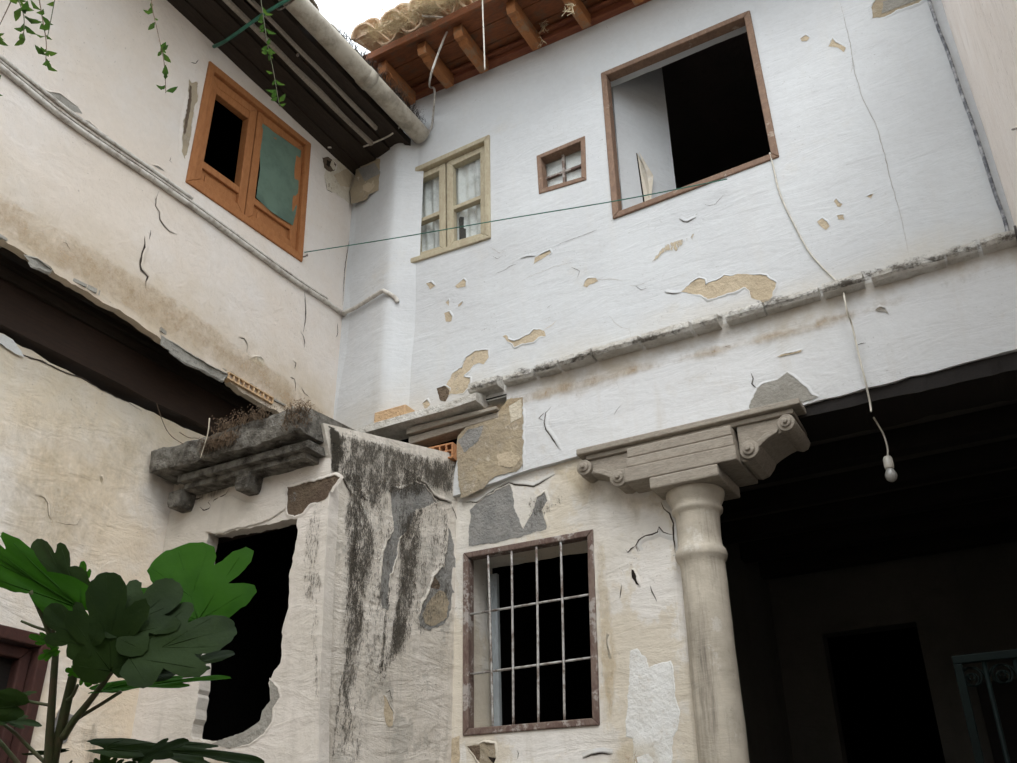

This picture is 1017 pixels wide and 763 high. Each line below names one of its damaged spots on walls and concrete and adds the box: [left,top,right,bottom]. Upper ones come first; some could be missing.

spalling [868,0,927,20]
crack [131,192,177,292]
peeling [681,273,779,303]
peeling [421,348,490,408]
peeling [747,371,820,409]
flaking render [206,472,344,535]
crack [343,476,368,501]
damp [333,433,454,760]
peeling [417,523,456,631]
crack [394,407,564,516]
spalling [427,394,550,546]
crack [620,500,678,595]